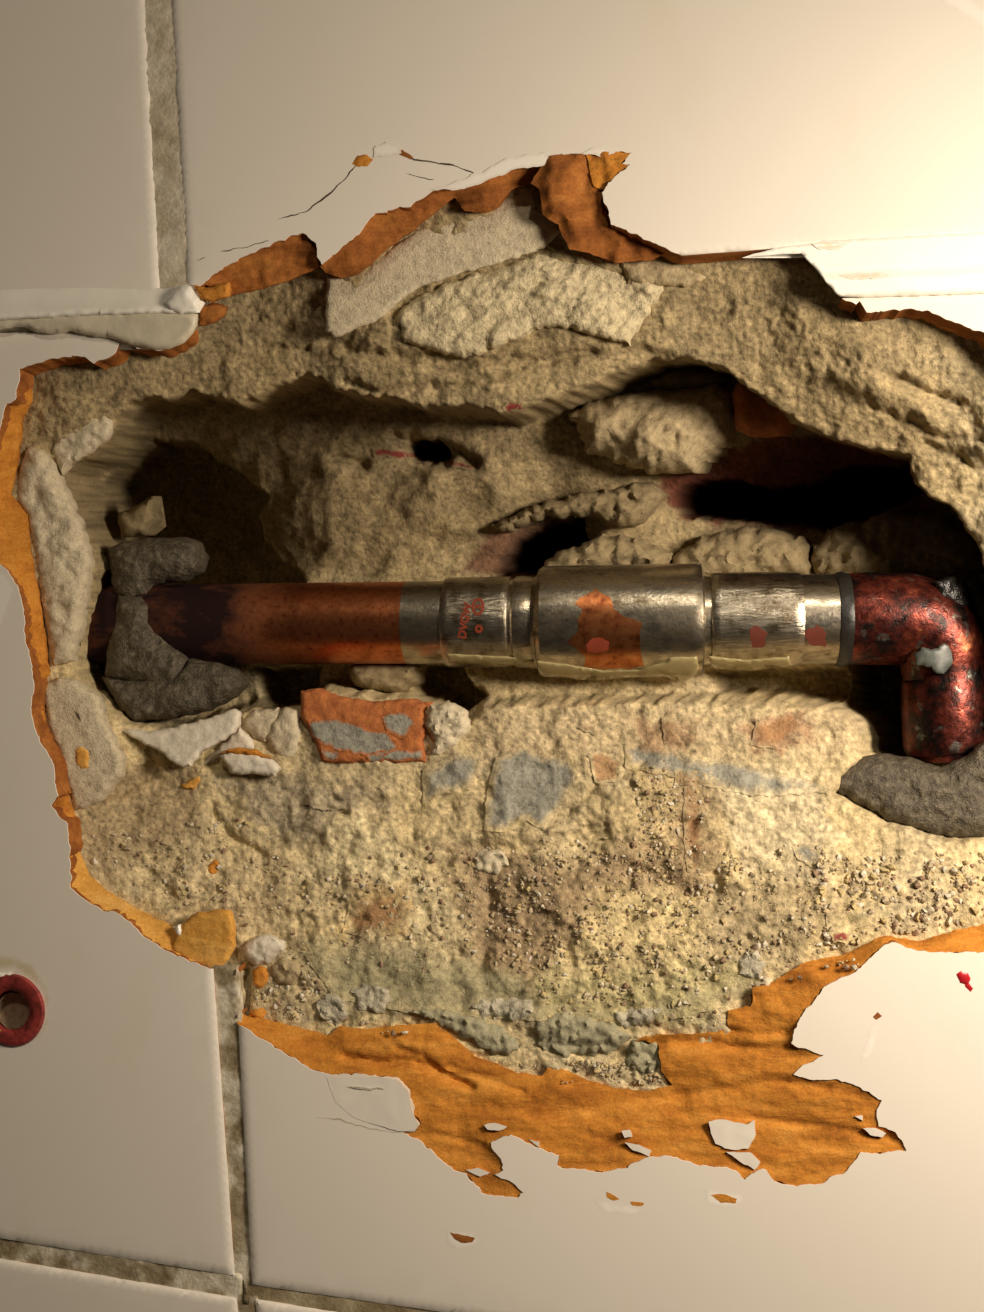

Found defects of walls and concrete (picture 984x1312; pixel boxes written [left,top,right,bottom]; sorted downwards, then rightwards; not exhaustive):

crack [200,150,474,260]
spalling [0,147,984,1091]
peeling [237,924,984,1197]
peeling [704,1188,747,1209]